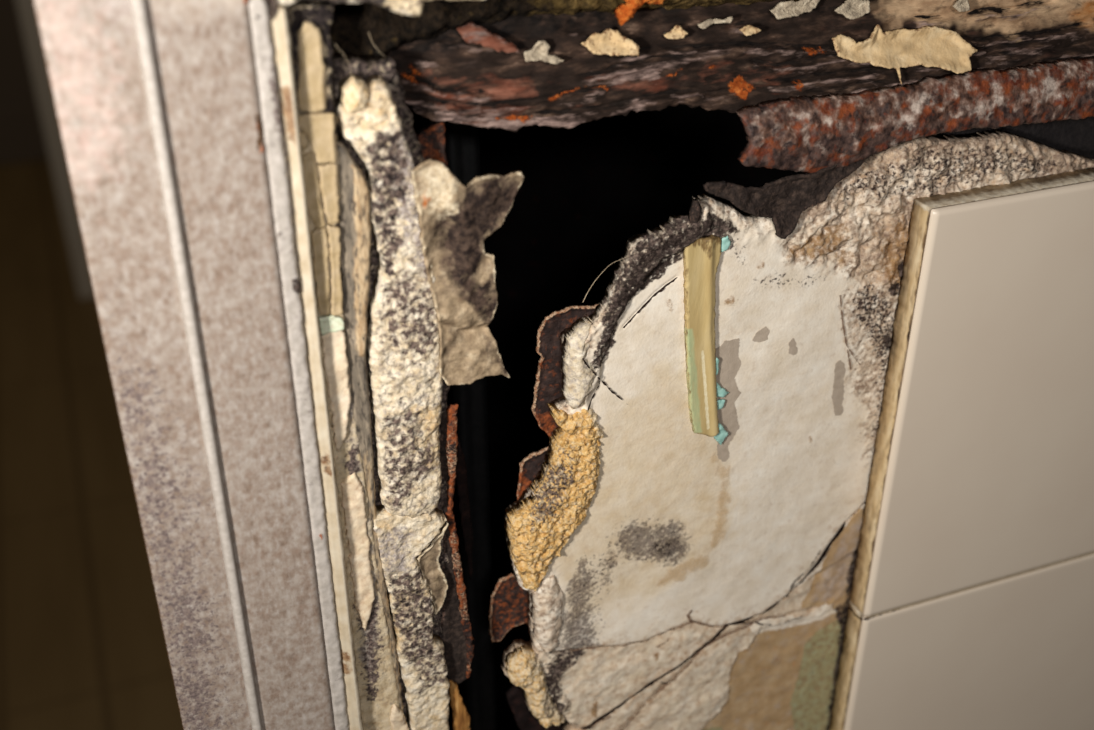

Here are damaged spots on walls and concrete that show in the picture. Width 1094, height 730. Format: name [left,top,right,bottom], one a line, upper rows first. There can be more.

damp [256,0,278,22]
peeling [297,20,344,336]
peeling [581,28,640,57]
peeling [832,24,978,84]
rust [729,57,1094,173]
rust [516,302,600,501]
spalling [479,104,807,591]
rust [439,402,474,685]
rust [488,573,528,642]
spalling [494,623,566,730]
crack [565,522,845,730]
peeling [702,509,863,730]